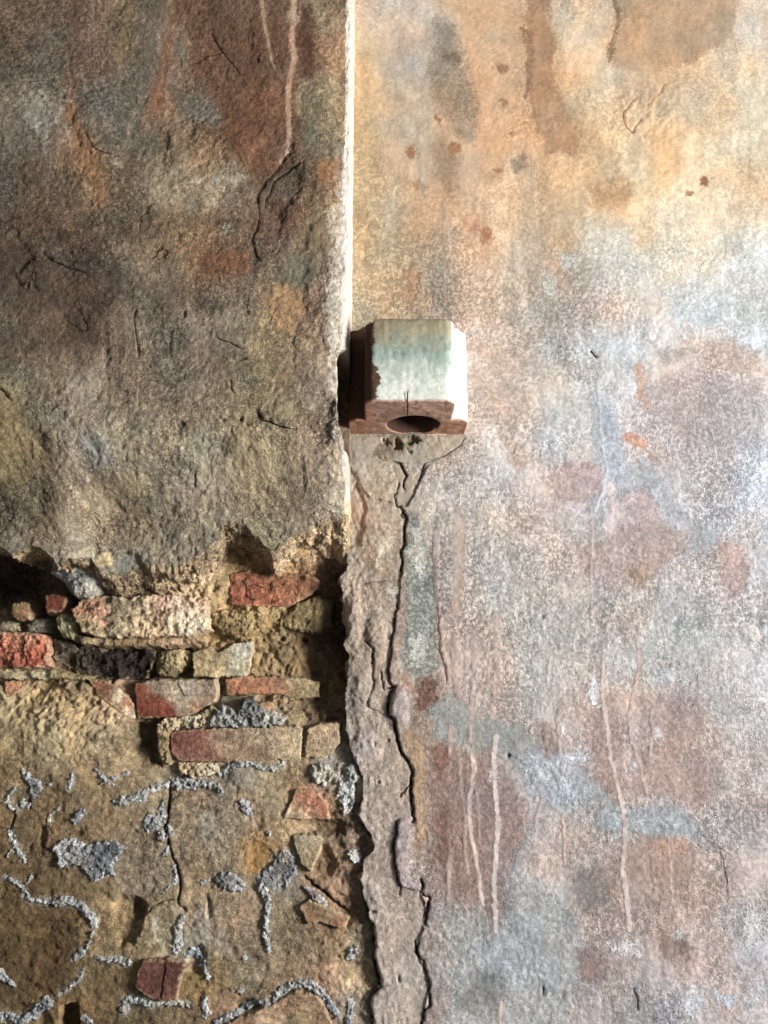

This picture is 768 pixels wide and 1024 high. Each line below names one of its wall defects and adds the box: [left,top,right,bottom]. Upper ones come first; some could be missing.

leakage [607,0,739,71]
crack [253,156,297,259]
leakage [428,0,645,299]
leakage [658,253,768,375]
leakage [634,363,652,412]
spalling [0,433,465,1024]
crack [352,439,465,1024]
crack [148,785,186,913]
leakage [427,613,710,1024]
leakage [735,903,766,952]
leakage [678,983,768,1018]